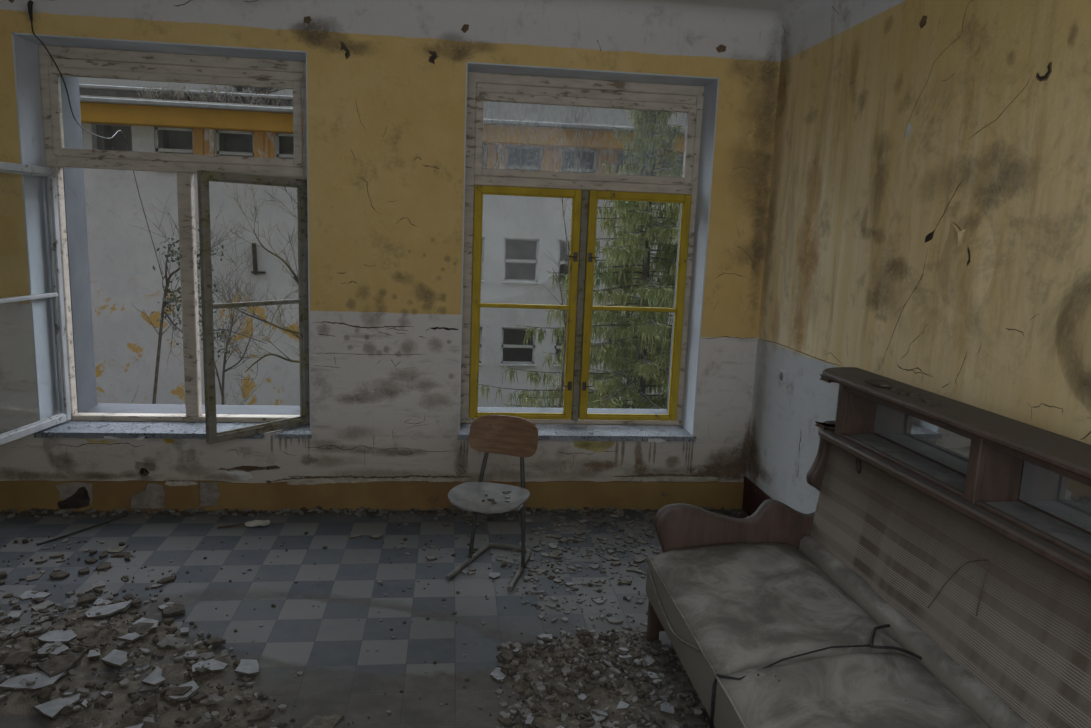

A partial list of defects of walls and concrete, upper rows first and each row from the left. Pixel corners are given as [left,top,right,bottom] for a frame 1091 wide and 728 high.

damp [696,426,765,479]
spalling [58,487,90,509]